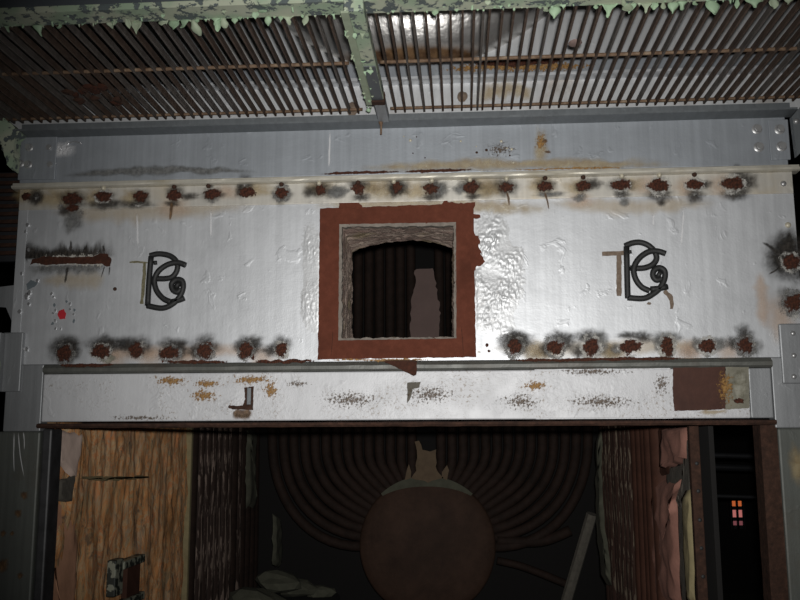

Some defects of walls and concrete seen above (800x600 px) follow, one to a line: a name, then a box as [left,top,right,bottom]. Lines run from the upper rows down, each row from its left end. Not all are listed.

peeling [78,7,342,36]
peeling [454,0,574,19]
peeling [586,0,793,18]
rust [59,186,149,231]
rust [166,184,221,219]
rust [305,167,632,208]
rust [684,172,753,202]
rust [54,339,149,367]
rust [159,338,227,364]
rust [235,338,314,364]
rust [501,328,758,411]
rust [155,375,278,401]